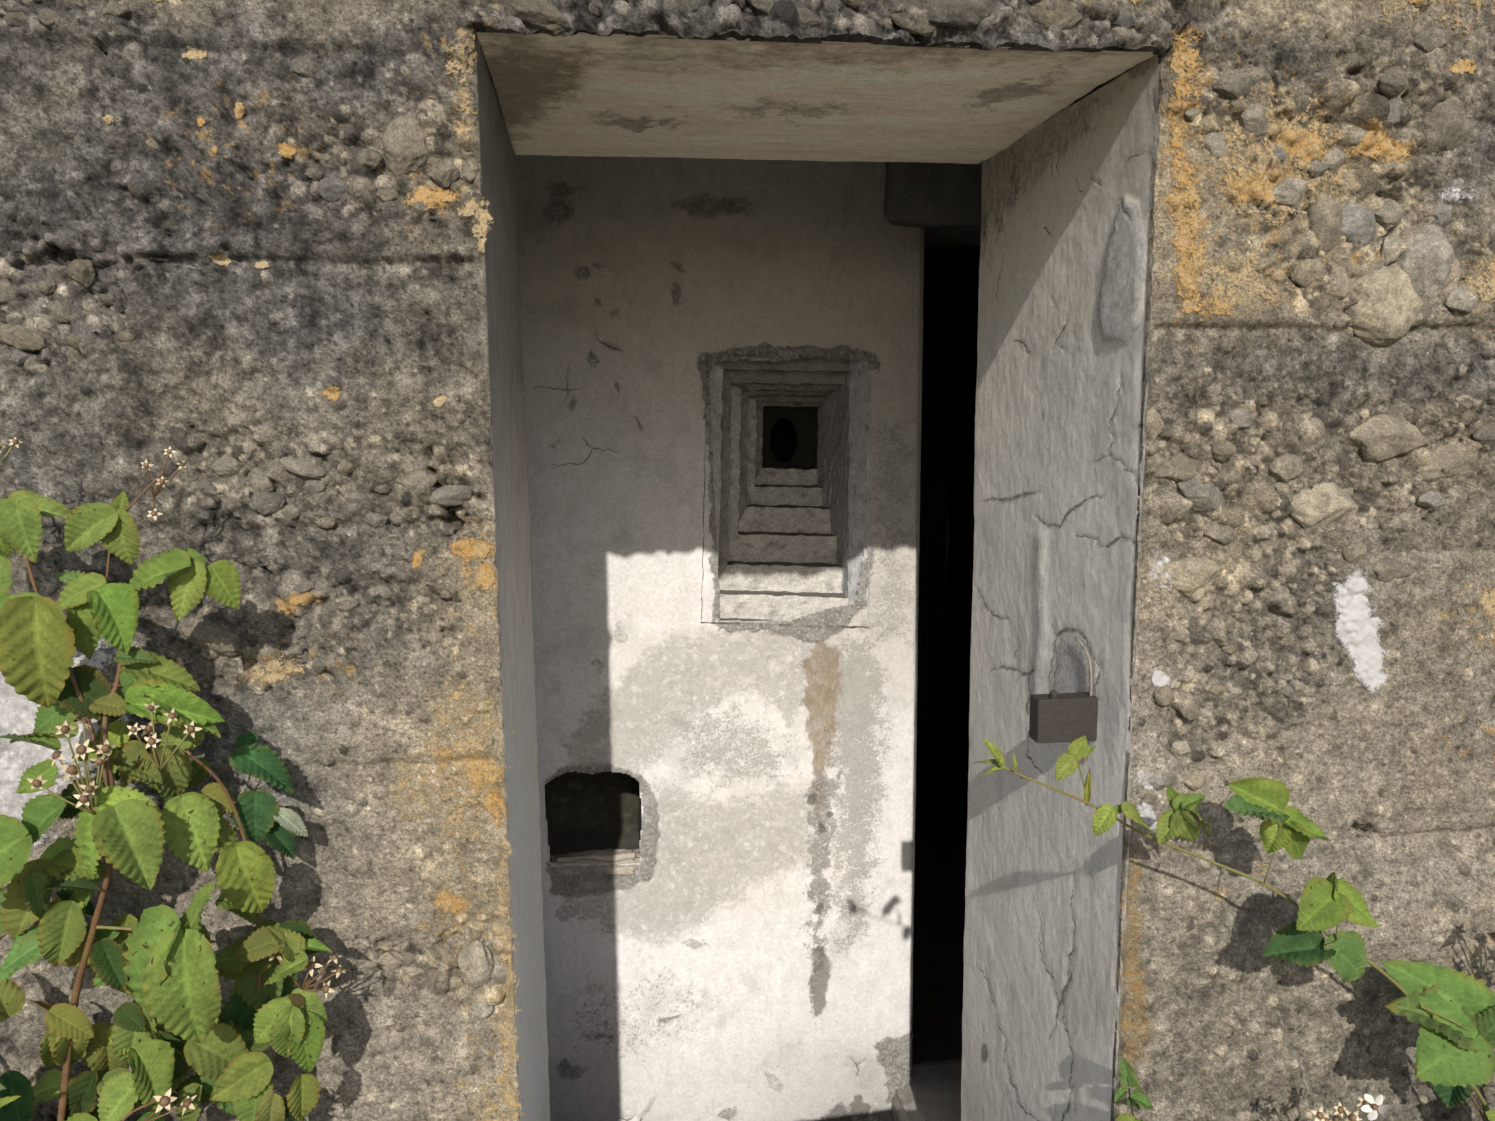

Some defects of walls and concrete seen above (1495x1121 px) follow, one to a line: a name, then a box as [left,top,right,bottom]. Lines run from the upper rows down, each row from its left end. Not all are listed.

flaking render [1053,634,1097,695]
leakage [800,770,842,1013]
crack [974,863,1076,1121]